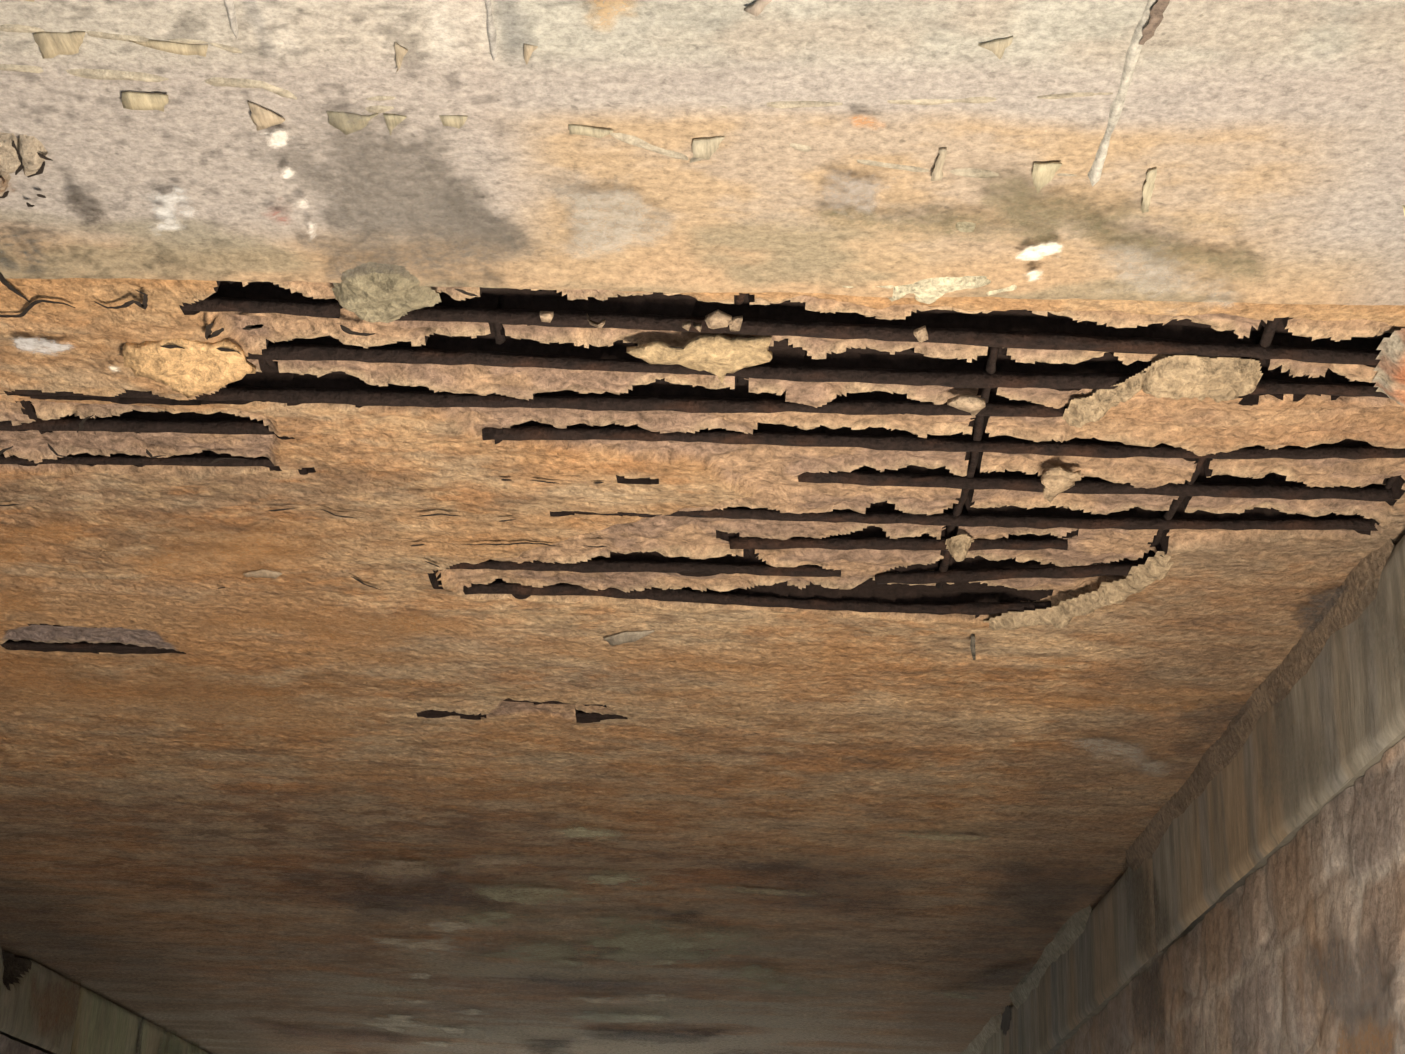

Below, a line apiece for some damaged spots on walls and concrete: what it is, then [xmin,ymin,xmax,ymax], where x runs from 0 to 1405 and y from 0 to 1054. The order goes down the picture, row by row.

peeling [33,31,85,59]
peeling [129,40,208,57]
peeling [248,101,285,131]
peeling [327,111,407,136]
peeling [569,124,614,139]
spalling [0,132,48,196]
peeling [1032,162,1062,194]
spalling [0,281,1405,626]
spalling [0,624,186,655]
spalling [414,697,629,723]
water stain [379,911,762,1004]
water stain [364,998,488,1046]